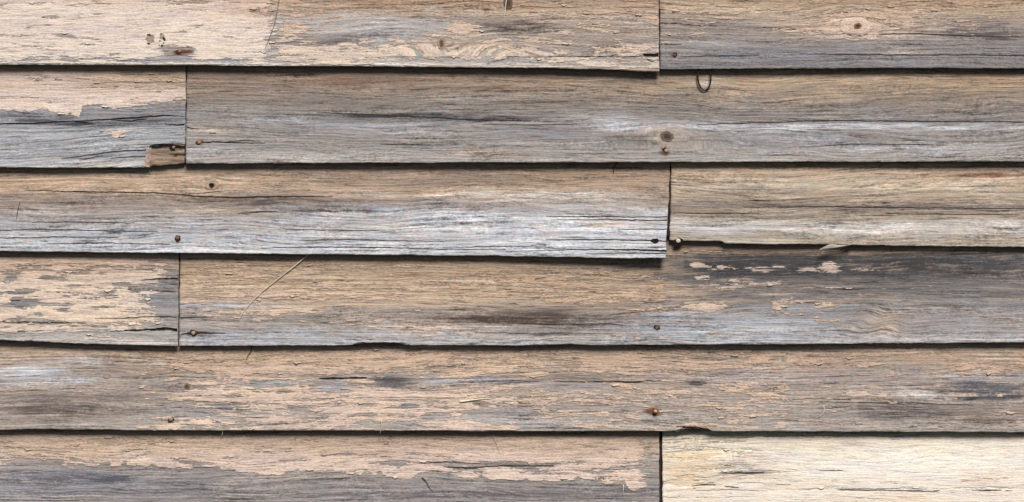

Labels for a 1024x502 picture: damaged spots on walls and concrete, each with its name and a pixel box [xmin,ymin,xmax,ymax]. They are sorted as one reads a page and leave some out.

peeling [100,129,130,138]
spalling [145,143,185,167]
peeling [0,250,1024,502]